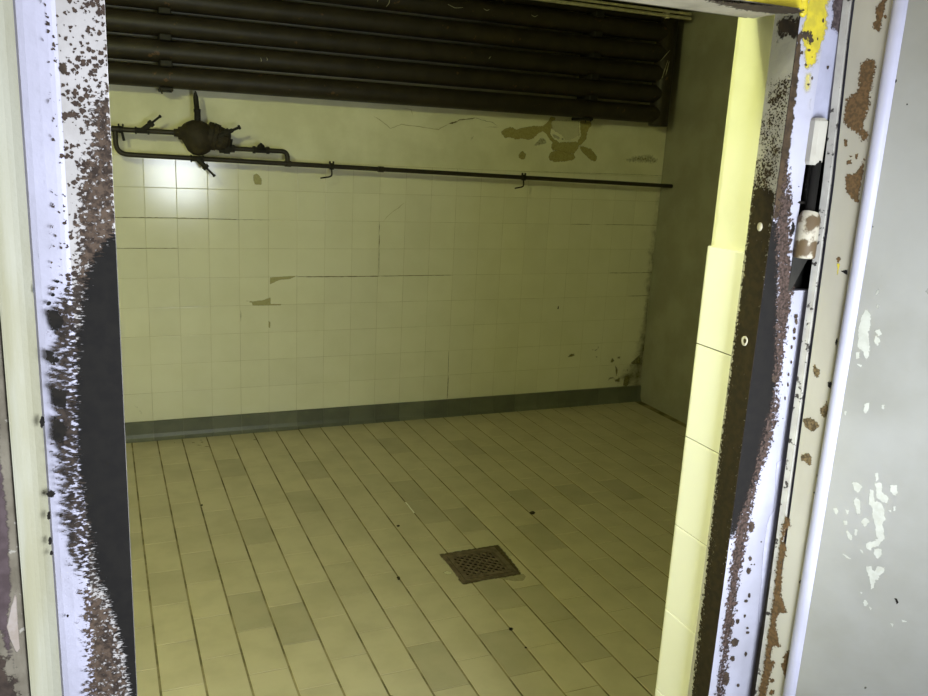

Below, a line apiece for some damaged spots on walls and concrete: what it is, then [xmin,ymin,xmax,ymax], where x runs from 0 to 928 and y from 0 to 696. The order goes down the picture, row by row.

crack [376,108,496,138]
peeling [501,117,597,162]
corrosion [843,58,877,203]
peeling [250,298,281,306]
crack [298,272,378,280]
corrosion [41,0,132,696]
corrosion [692,0,818,696]
peeling [856,310,882,367]
peeling [833,473,898,610]